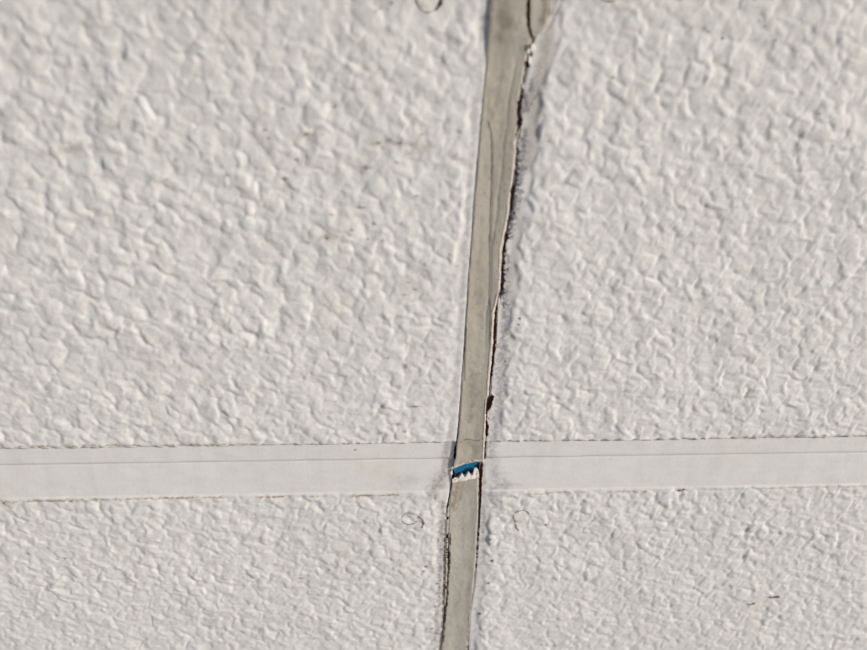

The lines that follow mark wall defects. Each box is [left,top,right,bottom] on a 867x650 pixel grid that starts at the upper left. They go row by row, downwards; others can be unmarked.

crack [416,0,443,13]
crack [452,0,542,650]
peeling [452,468,478,482]
crack [439,505,451,650]